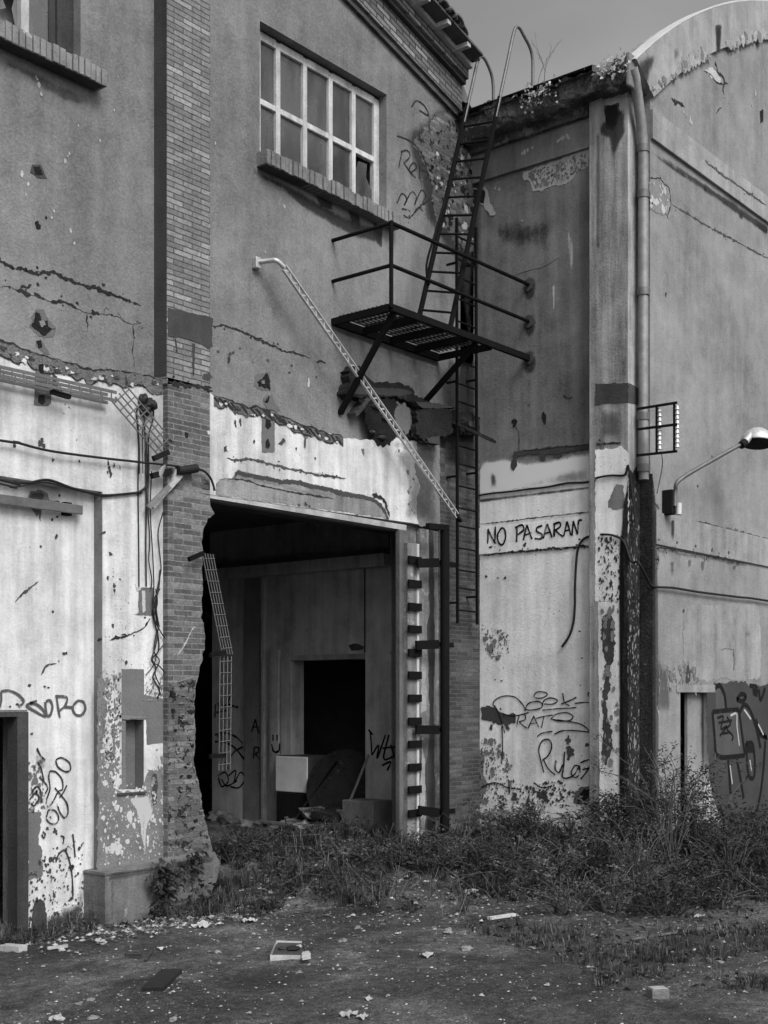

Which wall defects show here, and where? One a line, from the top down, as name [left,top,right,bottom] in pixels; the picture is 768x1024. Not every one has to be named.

peeling [649,47,722,91]
spalling [413,110,496,283]
peeling [522,149,589,191]
peeling [649,175,673,218]
crack [0,258,143,367]
spalling [0,309,163,395]
crack [212,324,326,363]
spalling [213,359,344,450]
spalling [337,366,480,527]
peeling [480,444,630,821]
peeling [96,660,210,870]
peeling [29,762,84,930]